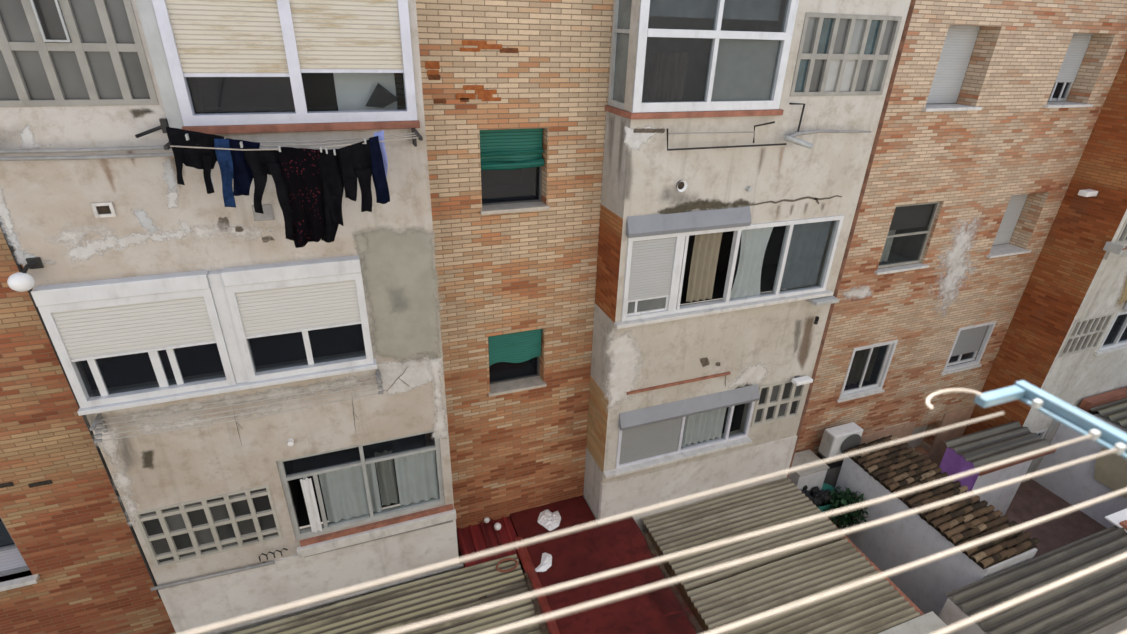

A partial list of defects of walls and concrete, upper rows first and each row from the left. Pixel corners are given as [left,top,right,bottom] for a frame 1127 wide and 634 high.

peeling [0,187,53,264]
peeling [57,210,273,261]
peeling [164,160,178,208]
crack [742,195,842,206]